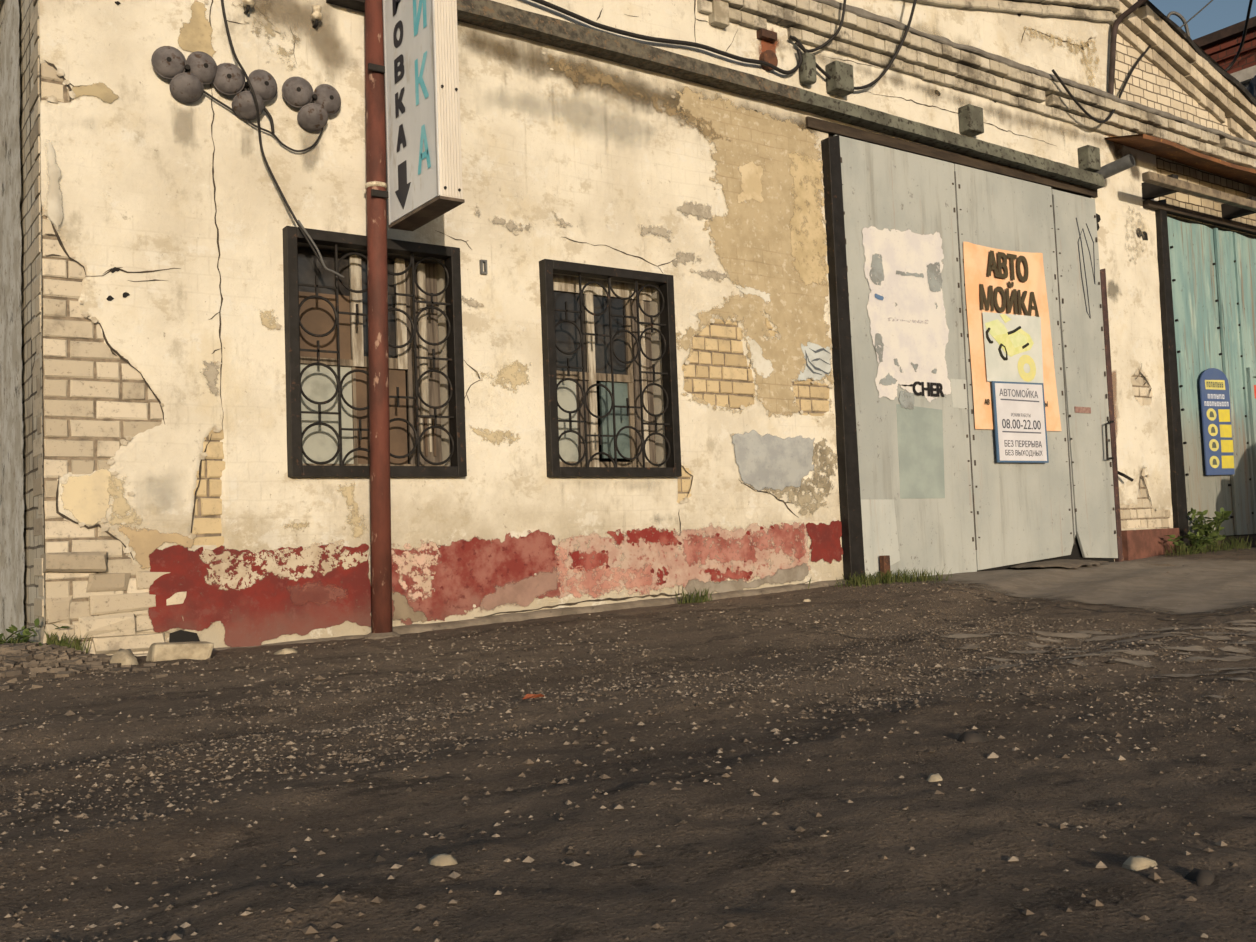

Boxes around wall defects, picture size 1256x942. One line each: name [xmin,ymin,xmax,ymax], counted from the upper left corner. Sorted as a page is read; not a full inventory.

peeling [178,0,216,57]
flaking render [40,63,119,103]
crack [31,220,181,282]
peeling [541,48,834,422]
crack [191,84,223,533]
crack [81,314,165,424]
flaking render [1131,368,1153,406]
flaking render [40,206,370,656]
peeling [470,427,519,446]
peeling [473,438,838,611]
flaking render [1120,467,1171,529]
peeling [391,539,440,623]